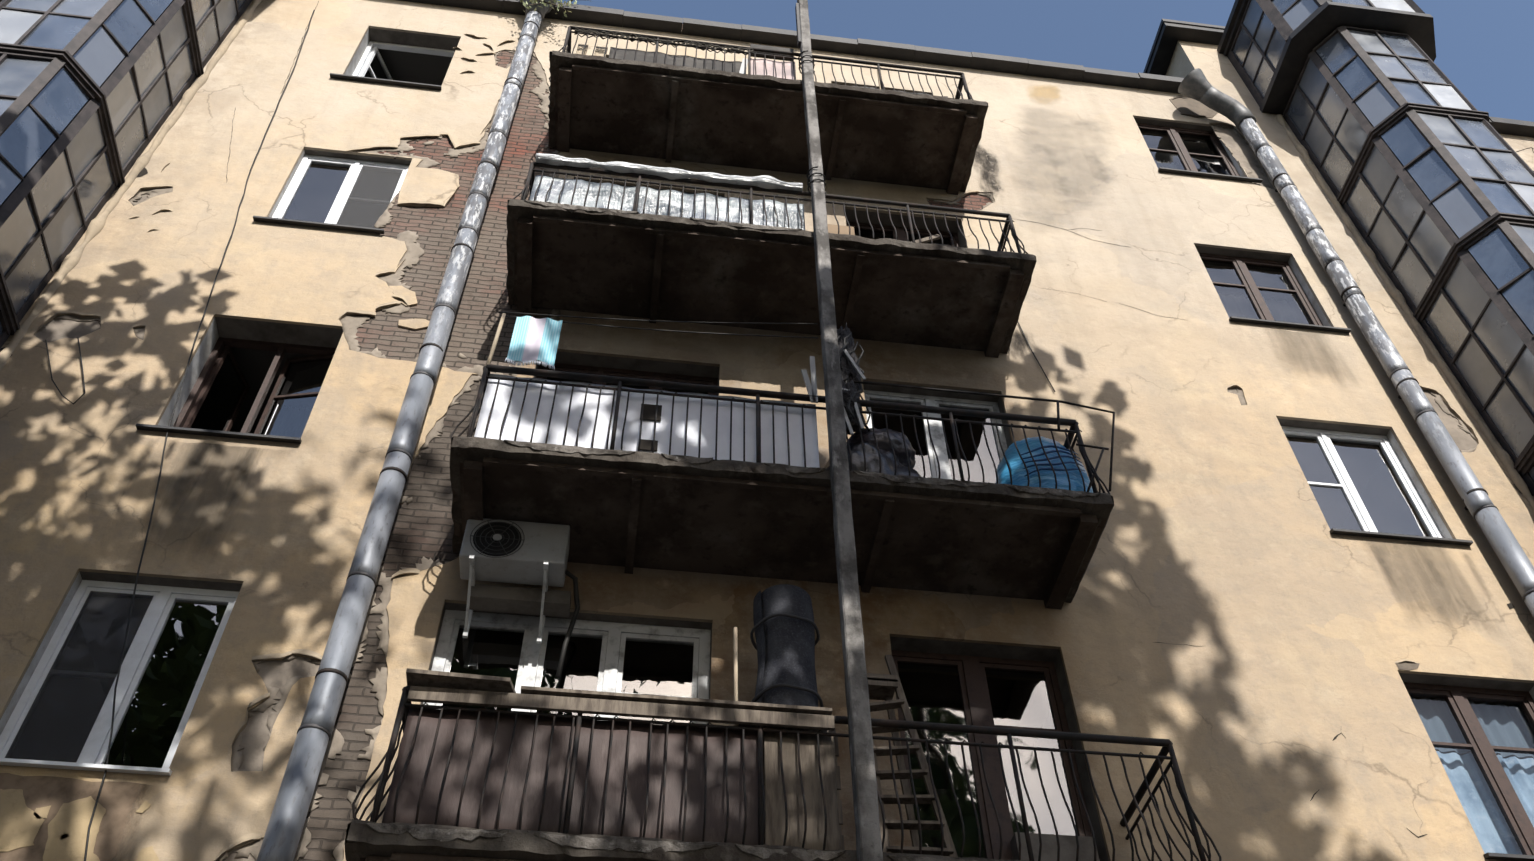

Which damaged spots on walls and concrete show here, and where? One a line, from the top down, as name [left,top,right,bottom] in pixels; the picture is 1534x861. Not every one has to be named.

spalling [129,162,174,232]
spalling [926,190,995,210]
spalling [690,217,802,231]
spalling [35,310,103,343]
spalling [294,34,639,861]
spalling [661,453,713,464]
spalling [764,463,825,475]
spalling [231,649,323,772]
peeling [0,773,159,861]
spalling [214,833,264,861]
spalling [527,831,846,861]